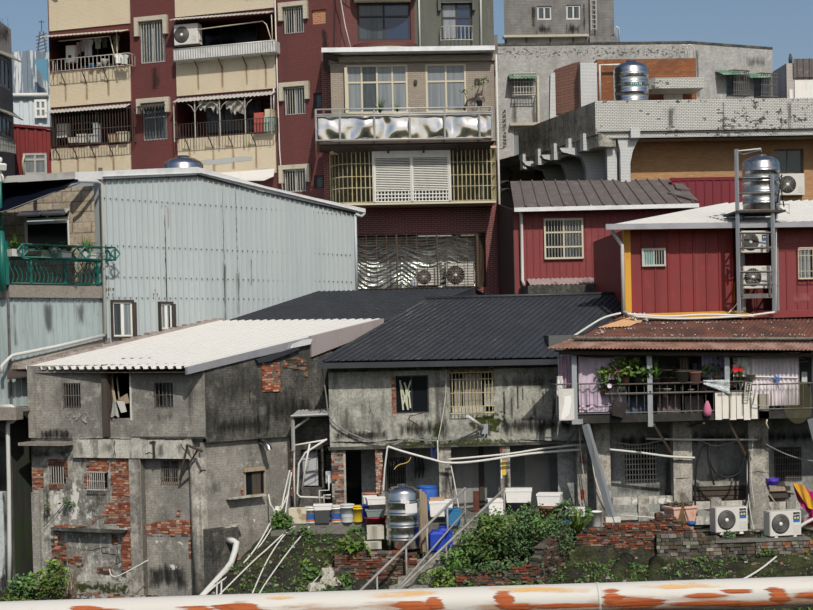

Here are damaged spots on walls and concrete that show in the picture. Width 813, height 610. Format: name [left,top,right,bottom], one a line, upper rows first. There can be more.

peeling [716,99,812,133]
flaking render [261,357,308,392]
leakage [337,411,387,440]
leakage [401,385,447,438]
leakage [501,379,570,433]
flaking render [32,459,68,490]
flaking render [51,458,132,583]
flaking render [146,510,192,558]
rust [382,591,444,610]
rust [483,585,813,610]